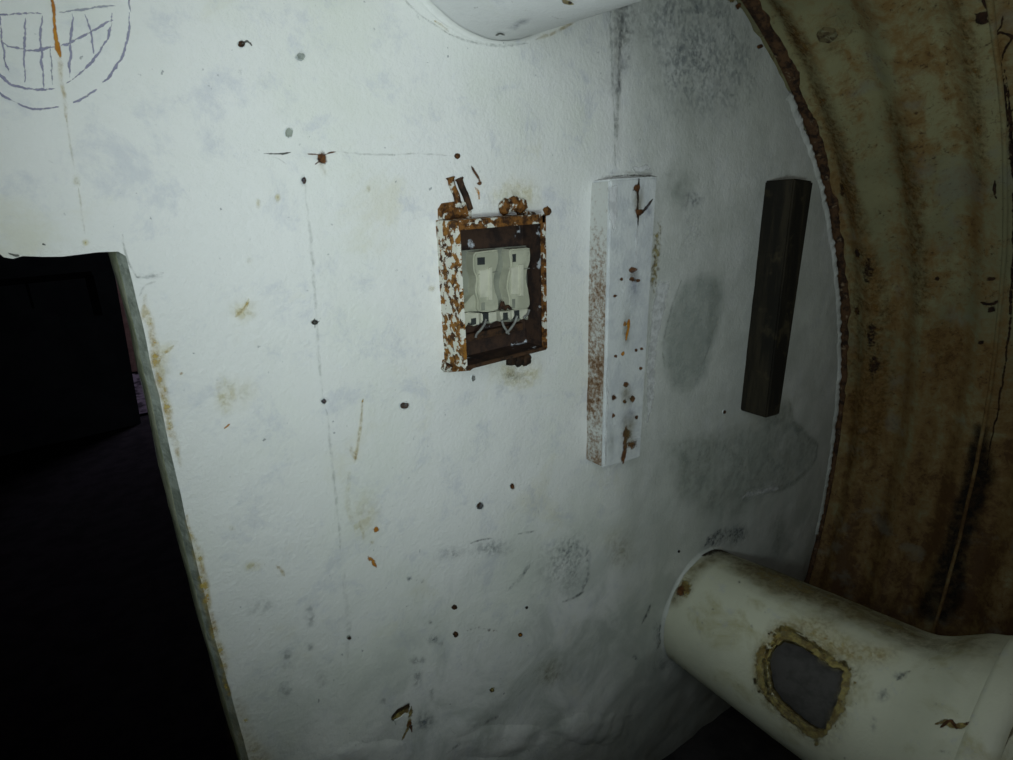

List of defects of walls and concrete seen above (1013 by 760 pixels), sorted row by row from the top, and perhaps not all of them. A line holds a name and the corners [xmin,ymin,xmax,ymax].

corrosion [51,0,61,57]